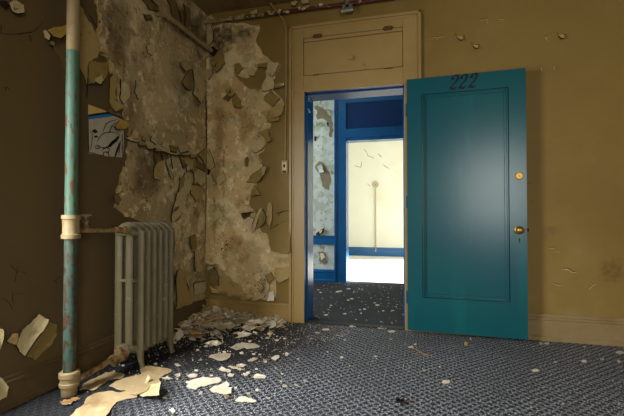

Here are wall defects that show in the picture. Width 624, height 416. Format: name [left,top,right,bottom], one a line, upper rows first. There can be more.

peeling [0,0,24,15]
peeling [308,105,334,137]
flaking render [80,0,289,309]
peeling [315,161,331,190]
peeling [0,314,57,360]
peeling [0,377,9,400]